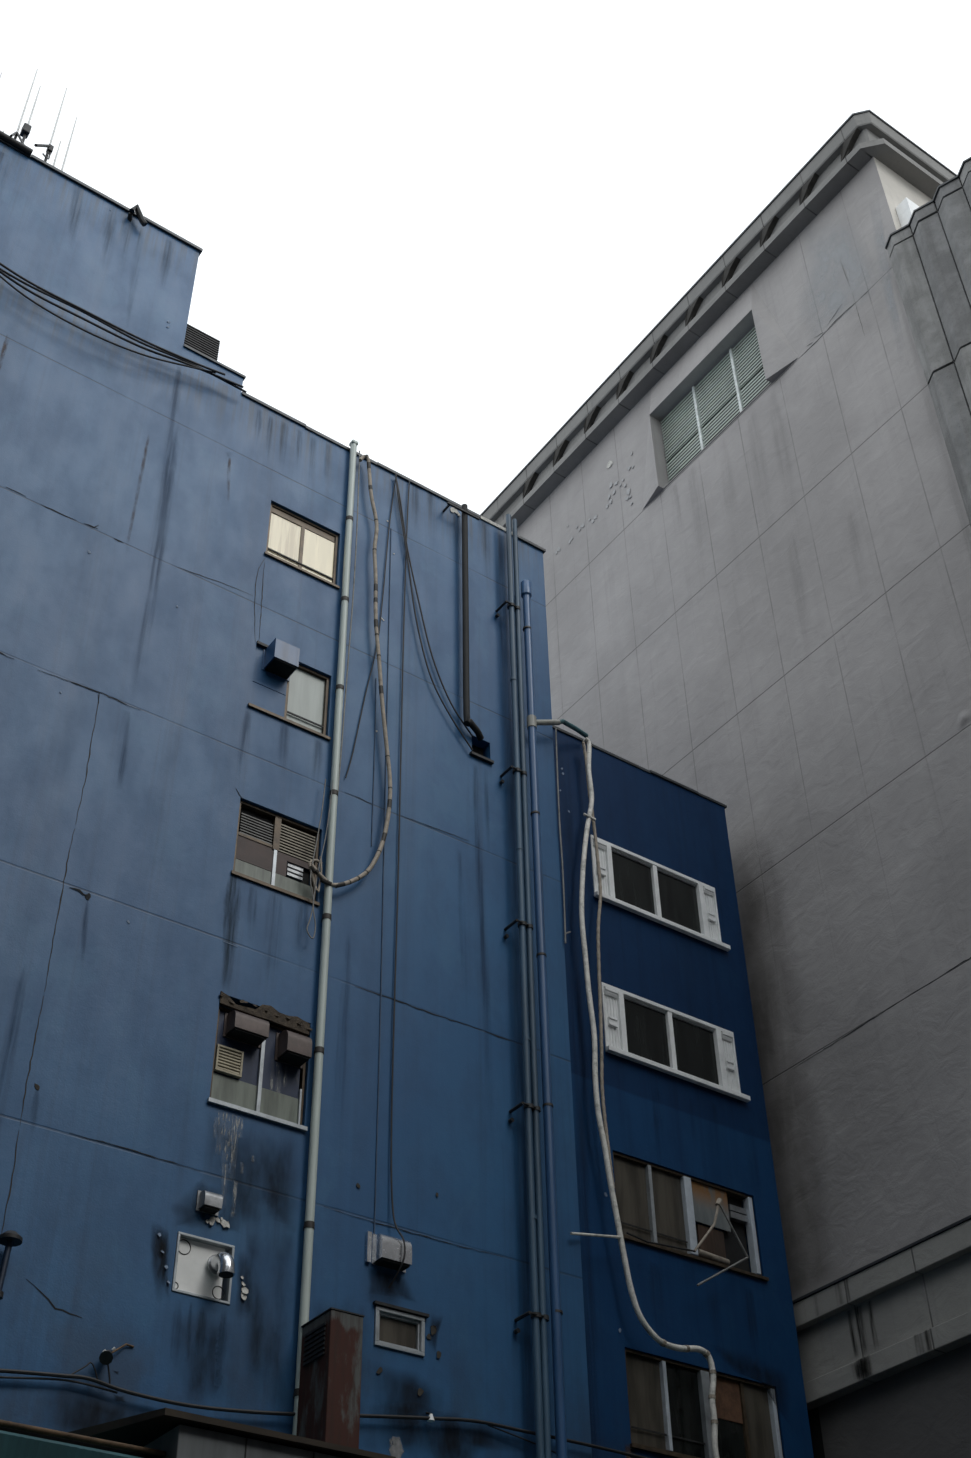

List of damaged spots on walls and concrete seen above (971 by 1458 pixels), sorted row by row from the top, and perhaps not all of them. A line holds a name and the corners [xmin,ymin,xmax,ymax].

flaking render [390,1437,404,1458]